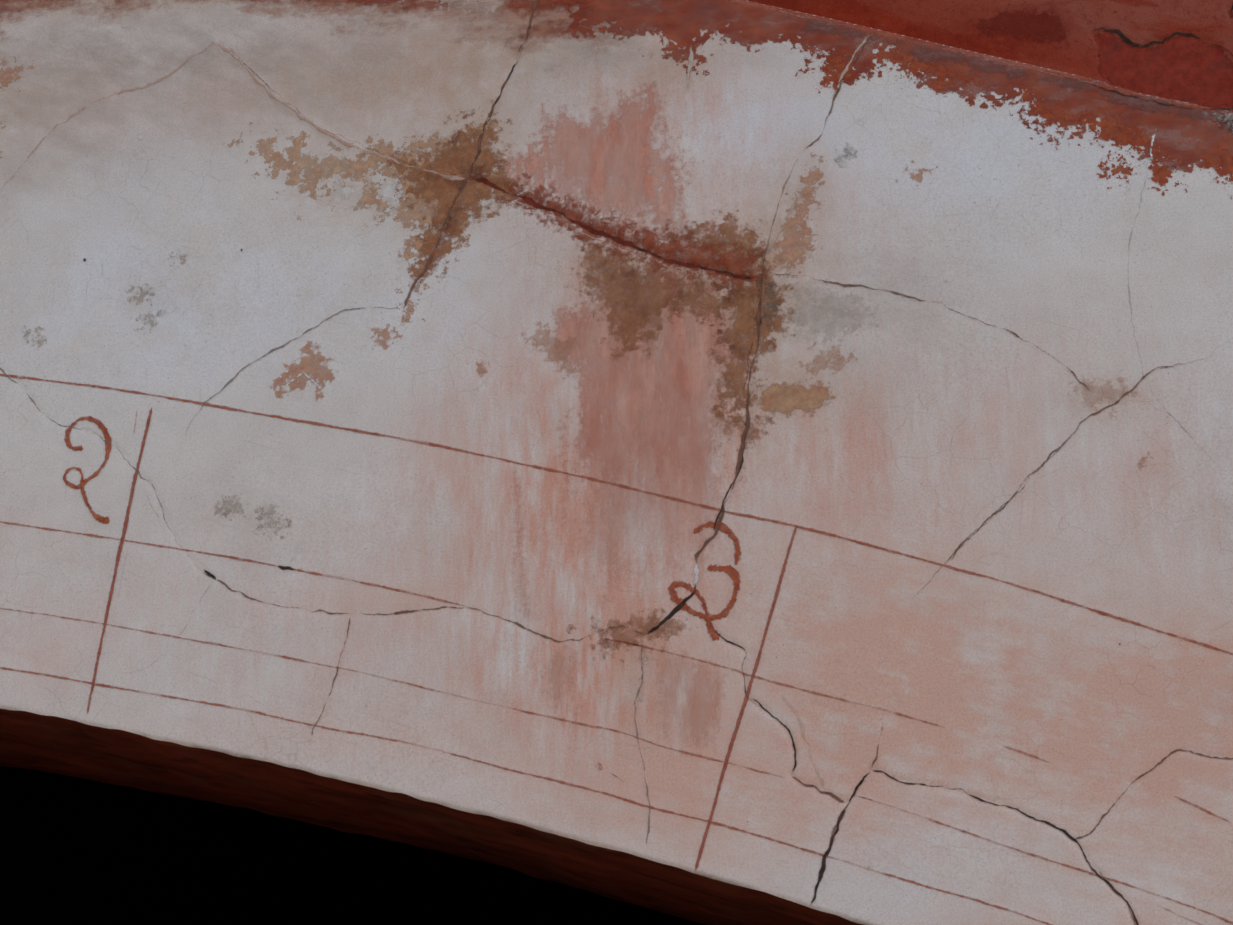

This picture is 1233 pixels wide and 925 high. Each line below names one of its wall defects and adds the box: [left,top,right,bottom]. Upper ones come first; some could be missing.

peeling [0,59,34,87]
peeling [228,99,516,267]
water stain [500,83,688,236]
peeling [296,0,1233,199]
crack [0,368,169,528]
peeling [273,341,335,398]
peeling [371,276,428,349]
crack [117,0,1020,842]
water stain [536,266,795,480]
crack [938,366,1172,571]
water stain [592,609,681,649]
crack [717,633,1233,925]